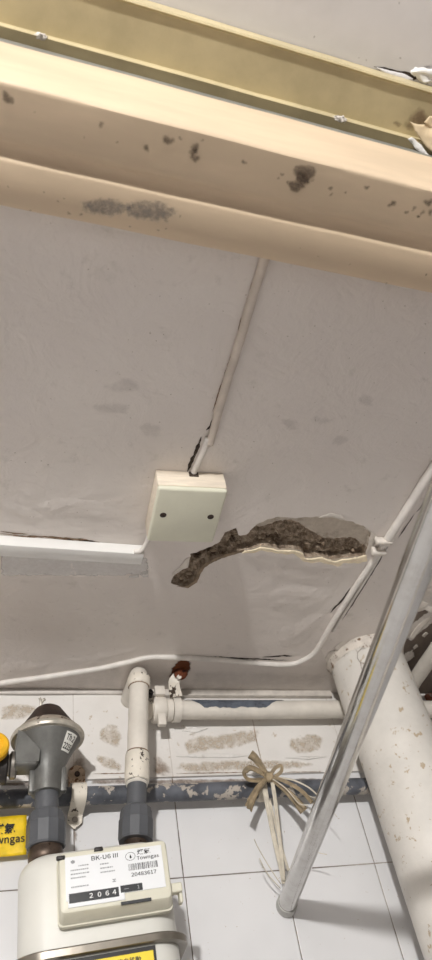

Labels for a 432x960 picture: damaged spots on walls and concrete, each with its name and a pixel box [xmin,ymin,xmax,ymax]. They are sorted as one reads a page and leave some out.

damp [86,199,172,219]
damp [278,167,315,191]
crack [187,355,231,472]
spalling [171,513,377,588]